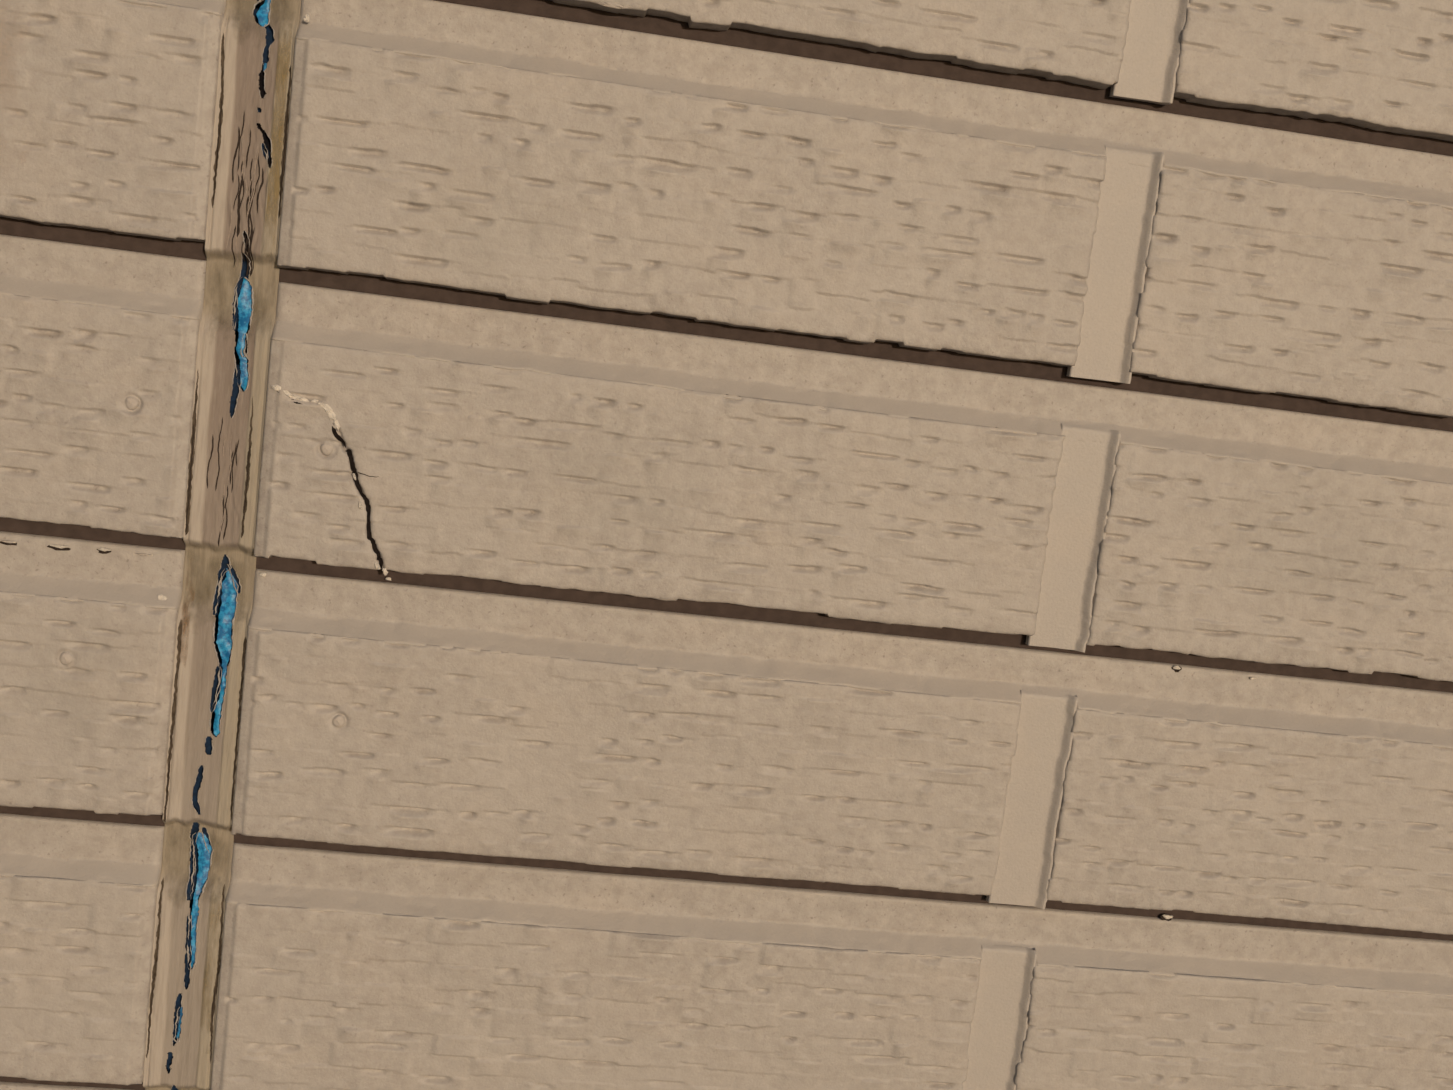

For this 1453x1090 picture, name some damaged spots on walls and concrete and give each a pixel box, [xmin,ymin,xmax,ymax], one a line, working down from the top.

crack [146,0,388,1090]